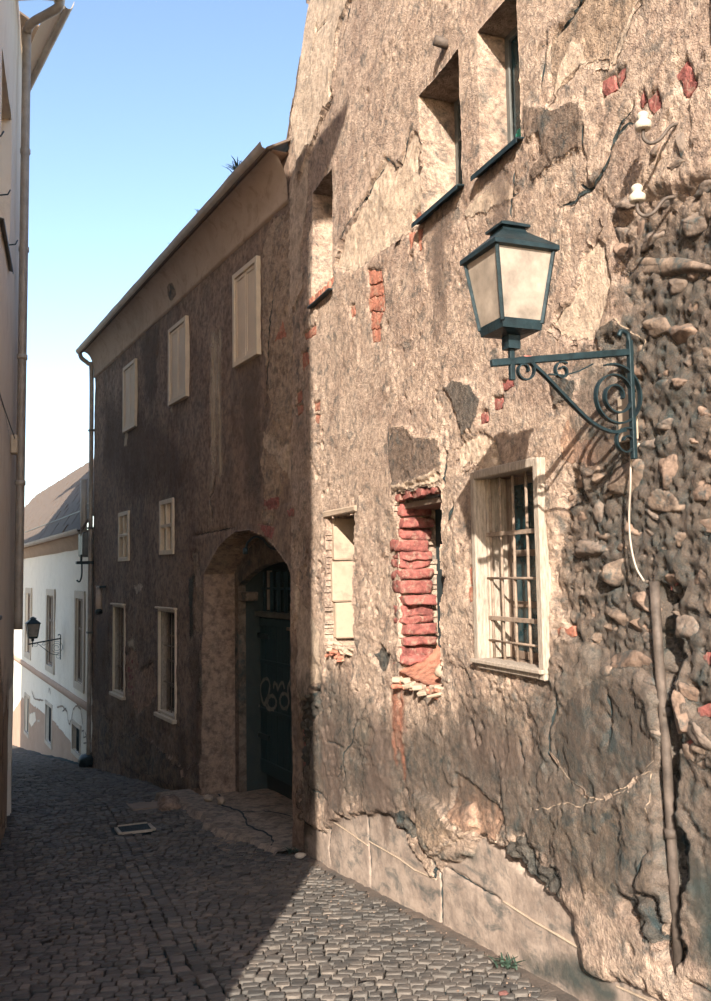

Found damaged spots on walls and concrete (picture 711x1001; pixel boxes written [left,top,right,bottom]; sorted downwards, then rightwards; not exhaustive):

crack [536,0,583,91]
flaking render [544,0,643,110]
flaking render [677,61,698,98]
flaking render [275,0,348,342]
crack [341,132,410,238]
crack [559,105,634,208]
flaking render [330,133,423,343]
flaking render [455,379,514,475]
crack [548,695,557,763]
flaking render [440,775,562,898]
crack [433,862,500,920]
spalling [621,893,672,944]